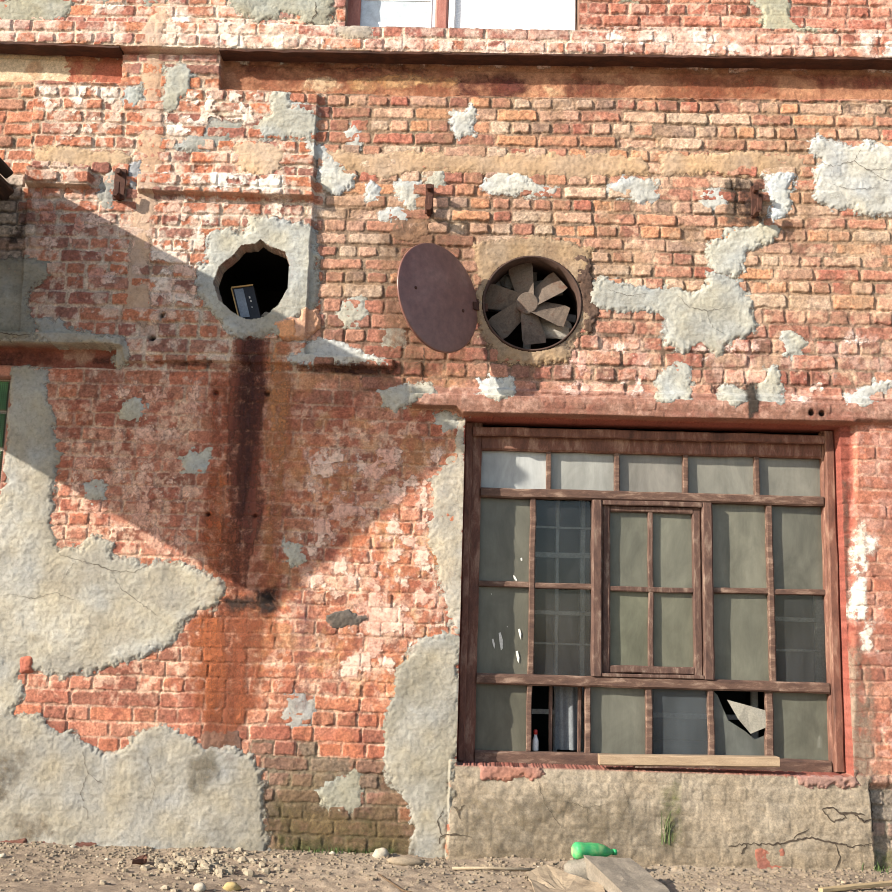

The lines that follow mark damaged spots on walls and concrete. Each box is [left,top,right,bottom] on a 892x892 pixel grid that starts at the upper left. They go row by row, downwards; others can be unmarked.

peeling [150,171,292,323]
spalling [274,307,321,342]
peeling [725,339,759,356]
peeling [560,356,597,395]
peeling [621,361,649,395]
peeling [791,382,824,403]
crack [11,552,156,615]
spalling [19,656,34,674]
spalling [200,731,242,750]
crack [729,783,876,869]